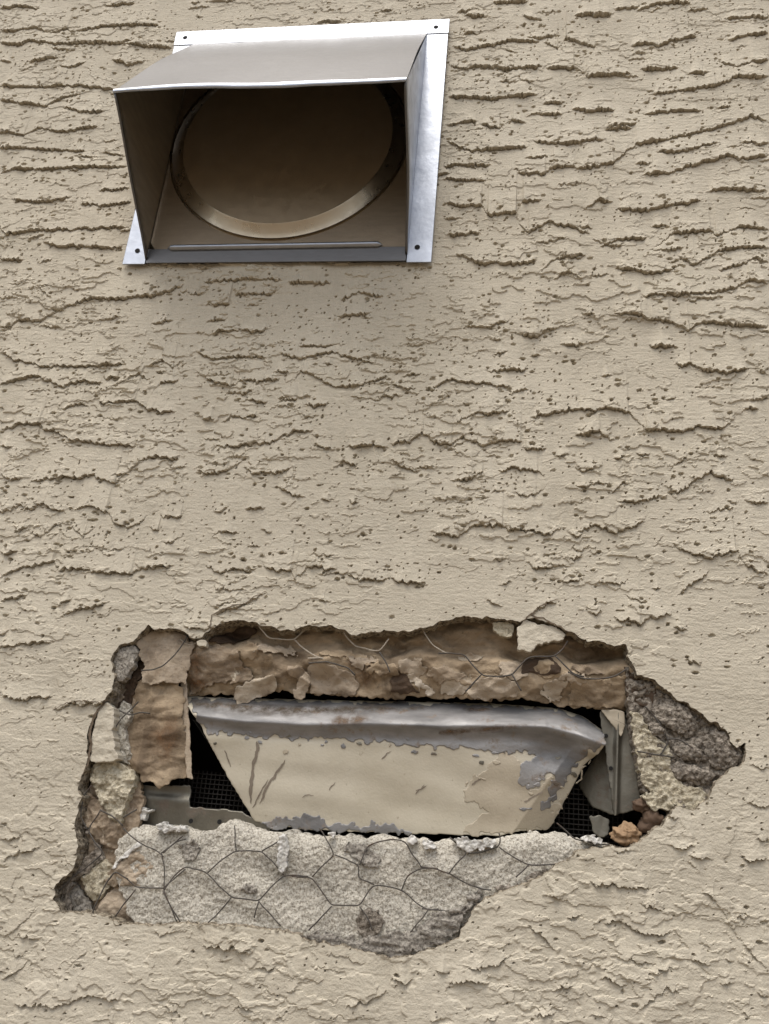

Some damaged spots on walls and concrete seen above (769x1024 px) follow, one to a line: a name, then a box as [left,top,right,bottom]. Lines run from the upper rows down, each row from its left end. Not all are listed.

spalling [53,616,746,959]